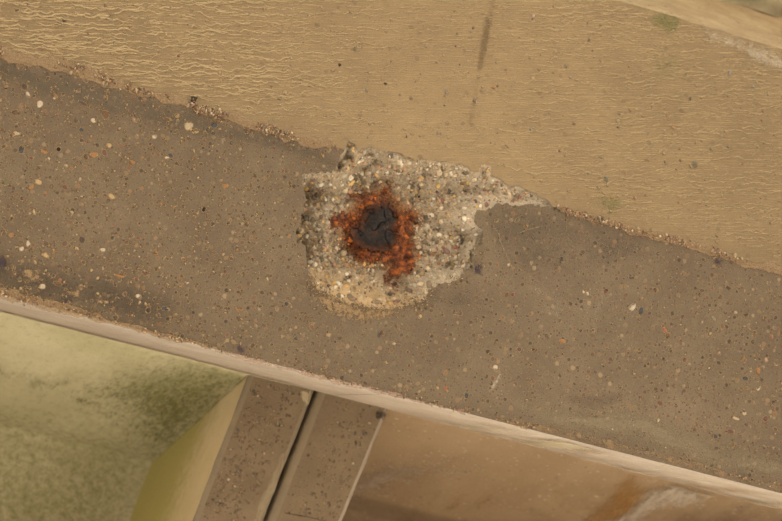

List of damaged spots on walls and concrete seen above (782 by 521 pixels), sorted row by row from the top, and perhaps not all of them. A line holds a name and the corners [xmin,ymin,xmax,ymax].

rust [331,184,418,284]
spalling [0,45,782,423]
spalling [481,395,782,492]
water stain [620,486,704,521]